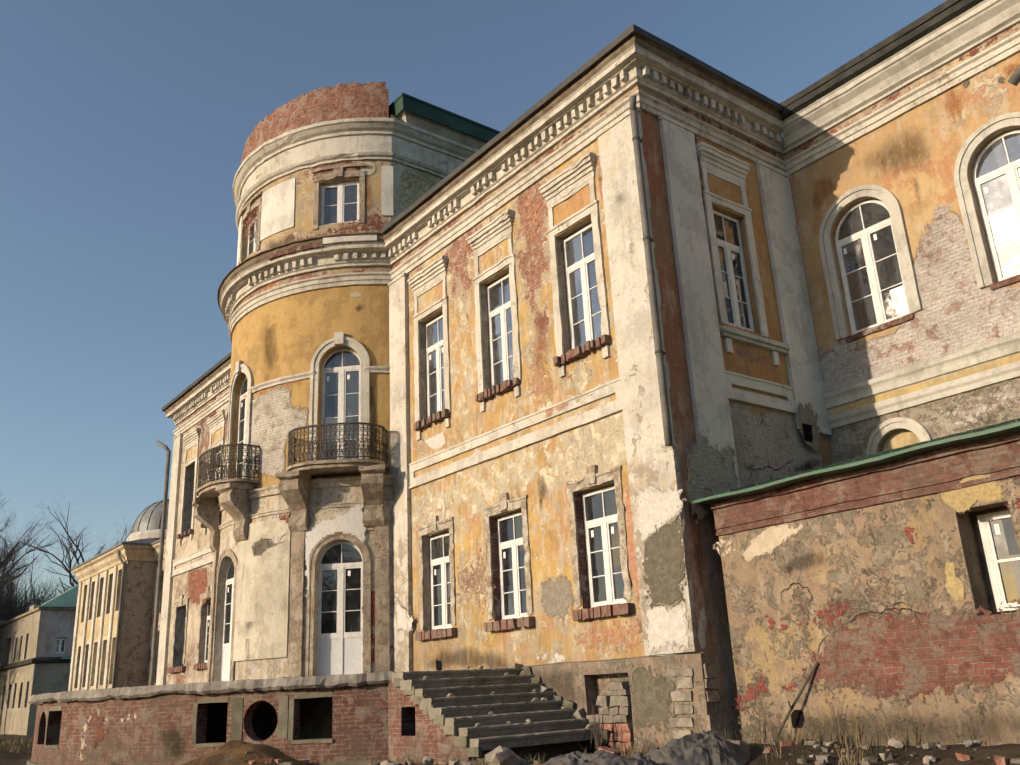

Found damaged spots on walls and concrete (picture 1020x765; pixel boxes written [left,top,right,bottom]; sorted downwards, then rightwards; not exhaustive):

flaking render [819,203,1020,393]
flaking render [242,380,309,479]
spalling [625,401,827,612]
crack [745,456,793,480]
peeling [937,474,1020,514]
flaking render [180,537,208,608]
crack [851,602,927,632]
flaking render [763,562,1020,705]
spalling [628,660,676,735]